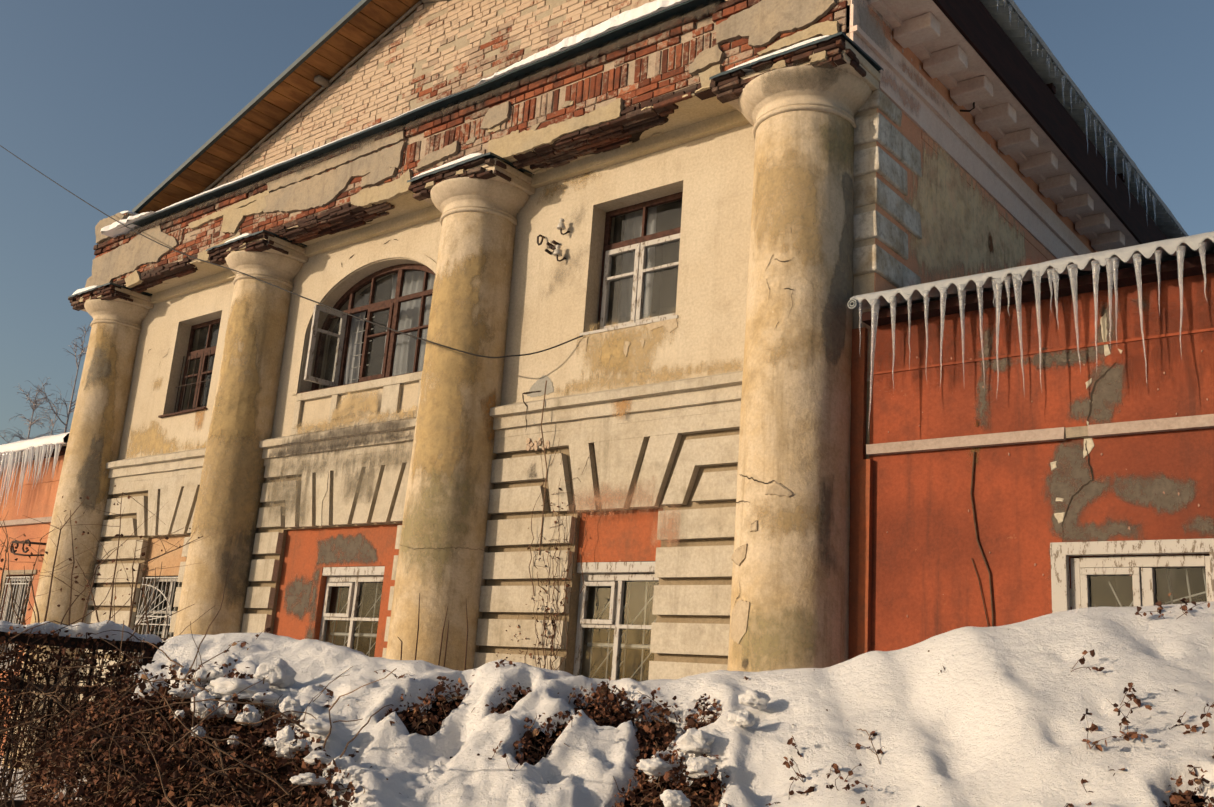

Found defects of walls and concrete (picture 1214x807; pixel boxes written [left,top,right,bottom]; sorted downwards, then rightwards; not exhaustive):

flaking render [68,0,866,311]